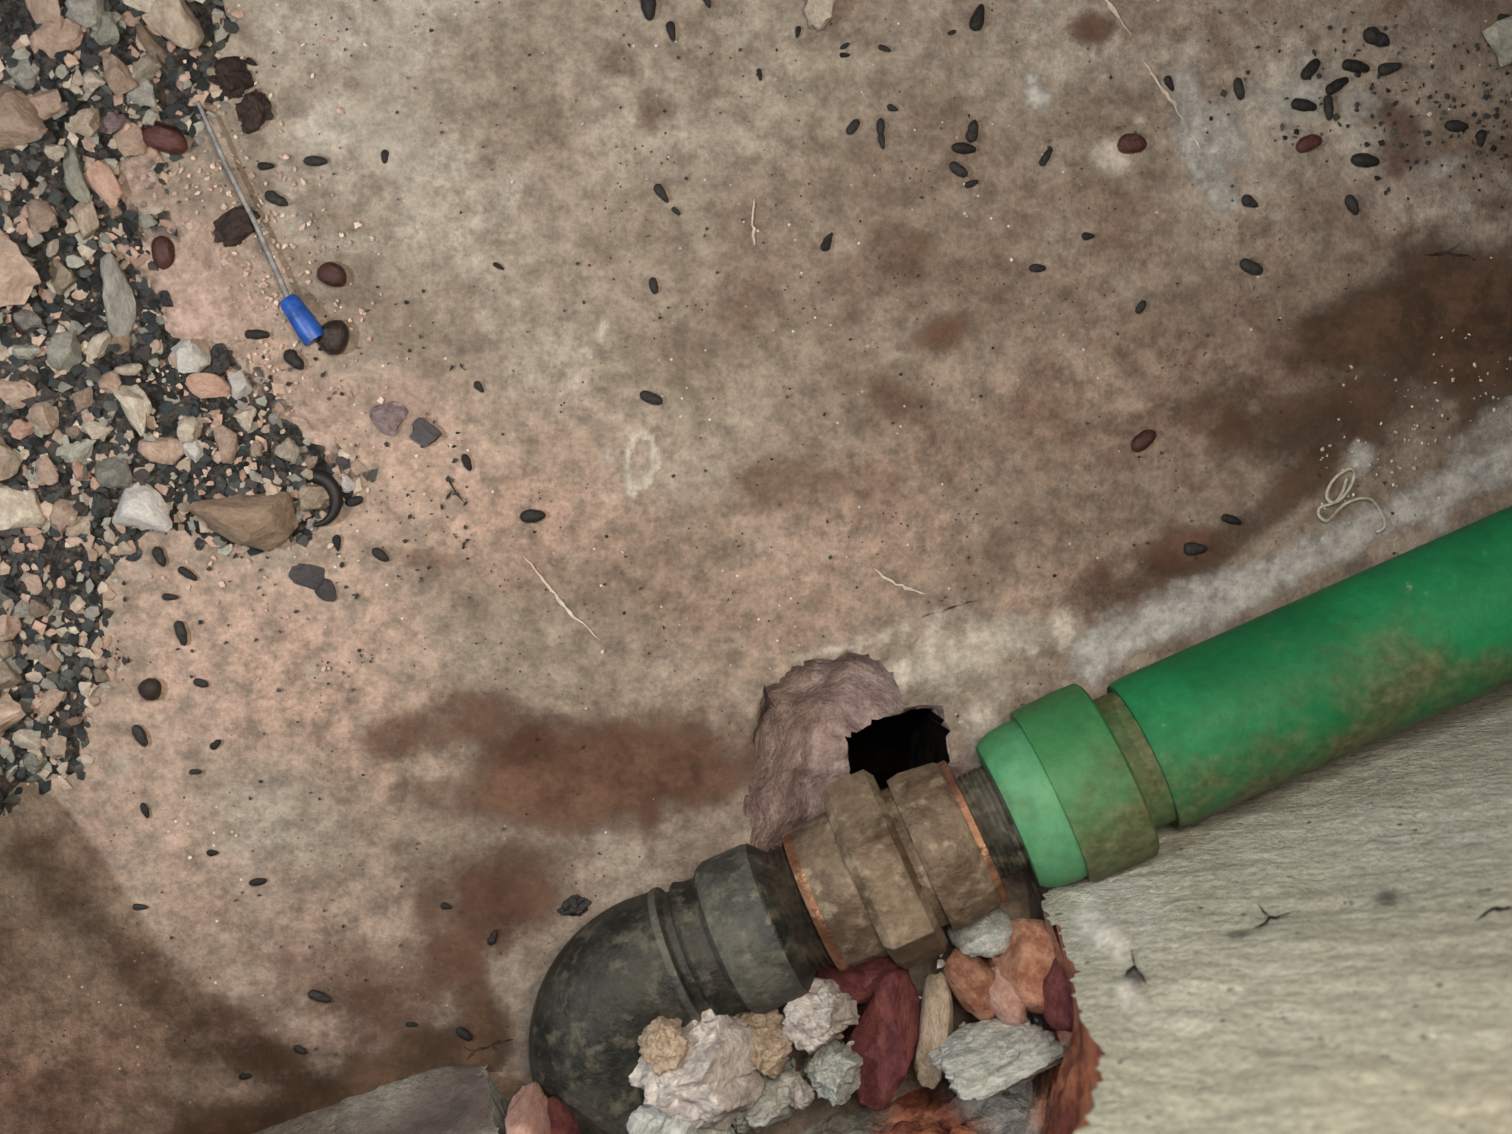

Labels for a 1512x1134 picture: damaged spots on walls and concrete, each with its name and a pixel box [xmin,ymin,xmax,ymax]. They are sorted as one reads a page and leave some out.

water stain [1174,72,1244,210]
water stain [1274,81,1326,115]
water stain [1071,235,1512,683]
spalling [743,611,1079,852]
spalling [482,1069,509,1134]
spalling [802,868,1142,1134]